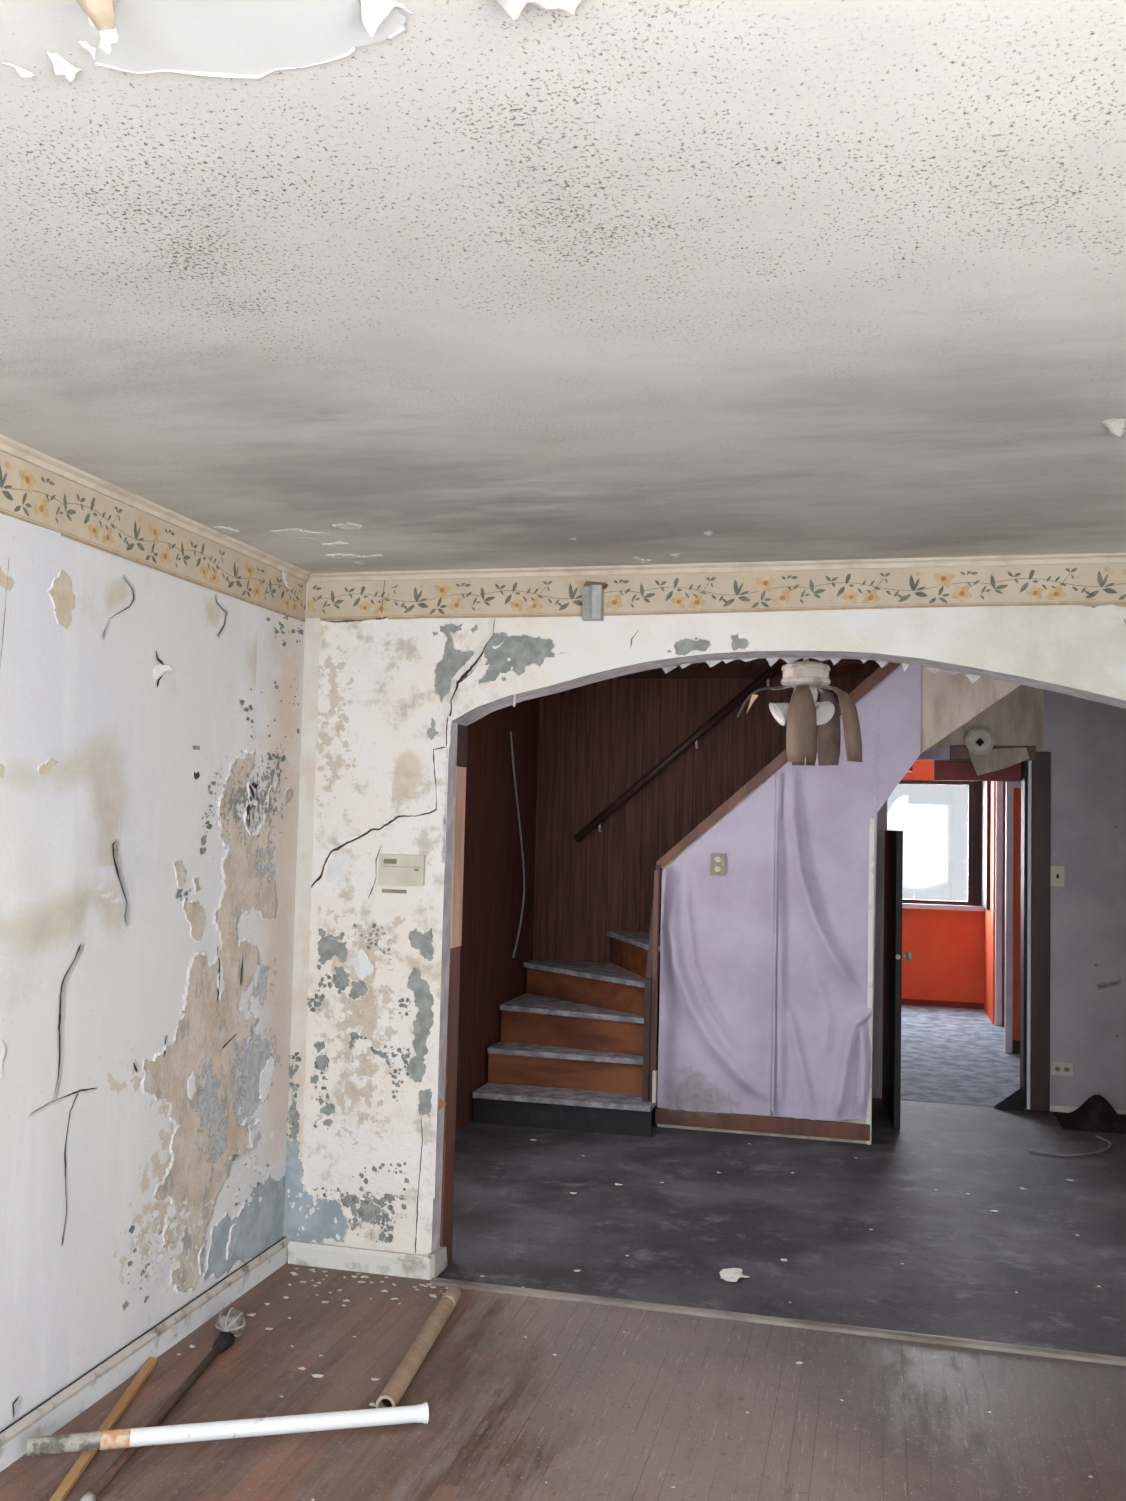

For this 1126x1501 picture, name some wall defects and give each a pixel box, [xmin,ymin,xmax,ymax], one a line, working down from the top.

peeling [2,63,35,78]
peeling [46,0,413,83]
peeling [497,0,581,21]
peeling [0,567,14,592]
peeling [46,568,76,631]
peeling [427,622,556,741]
crack [311,618,495,891]
crack [112,839,131,927]
peeling [59,622,445,1381]
crack [29,944,98,1245]